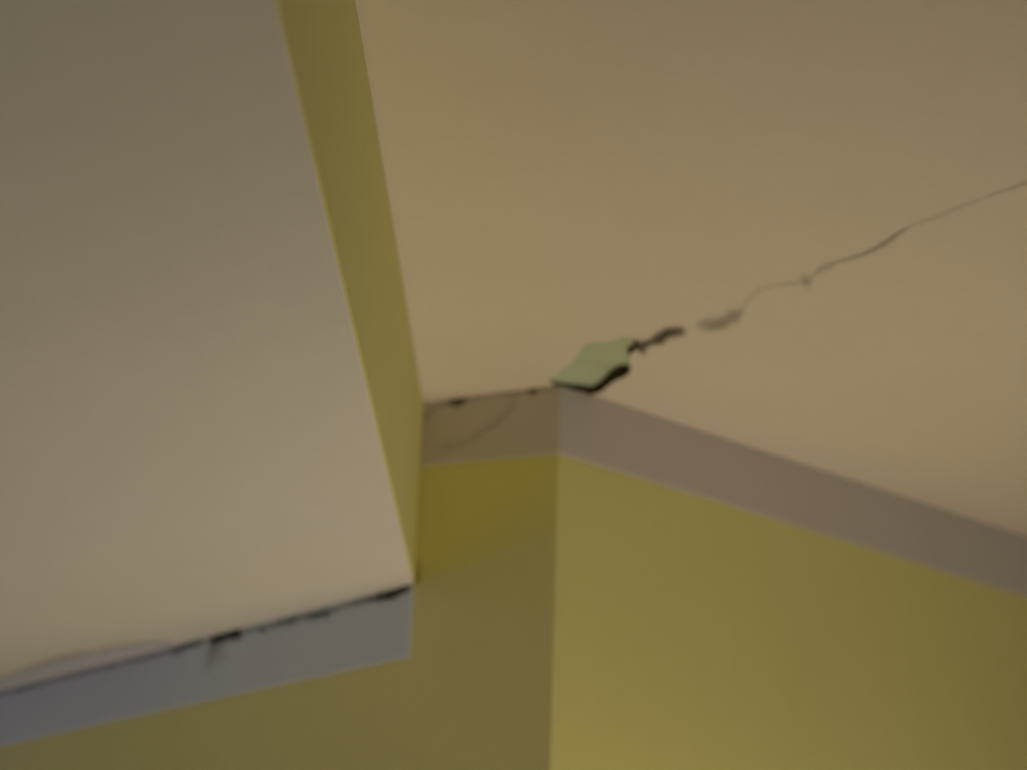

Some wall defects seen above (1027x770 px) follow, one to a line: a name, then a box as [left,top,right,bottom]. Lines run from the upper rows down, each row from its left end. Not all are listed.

crack [635,329,682,352]
flaking render [550,337,637,395]
crack [449,397,467,405]
crack [372,585,410,601]
crack [175,611,327,651]